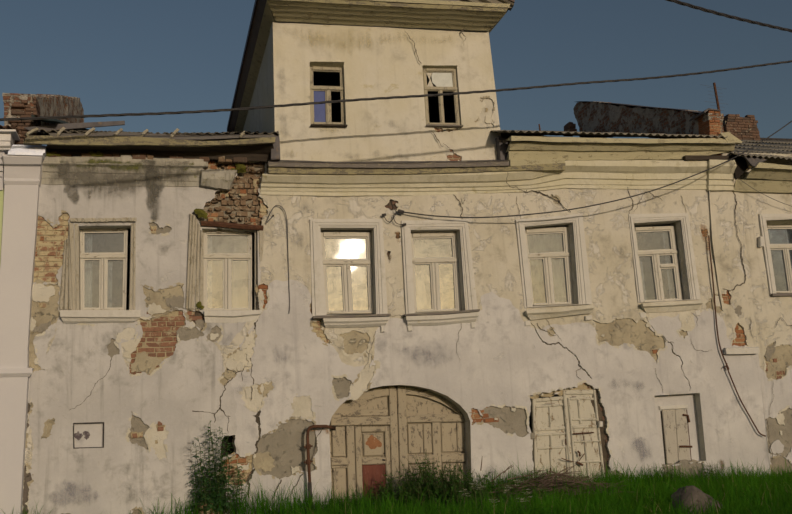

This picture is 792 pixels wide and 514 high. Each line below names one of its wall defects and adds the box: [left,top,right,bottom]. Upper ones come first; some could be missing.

leakage [52,157,193,220]
crack [725,192,746,291]
flaking render [29,210,70,372]
flaking render [107,282,224,377]
crack [535,323,589,378]
flaking render [591,318,668,362]
flaking render [764,342,792,381]
crack [192,358,261,495]
flaking render [216,394,318,488]
crack [273,428,323,507]
flaking render [468,380,626,479]
flaking render [766,405,792,476]